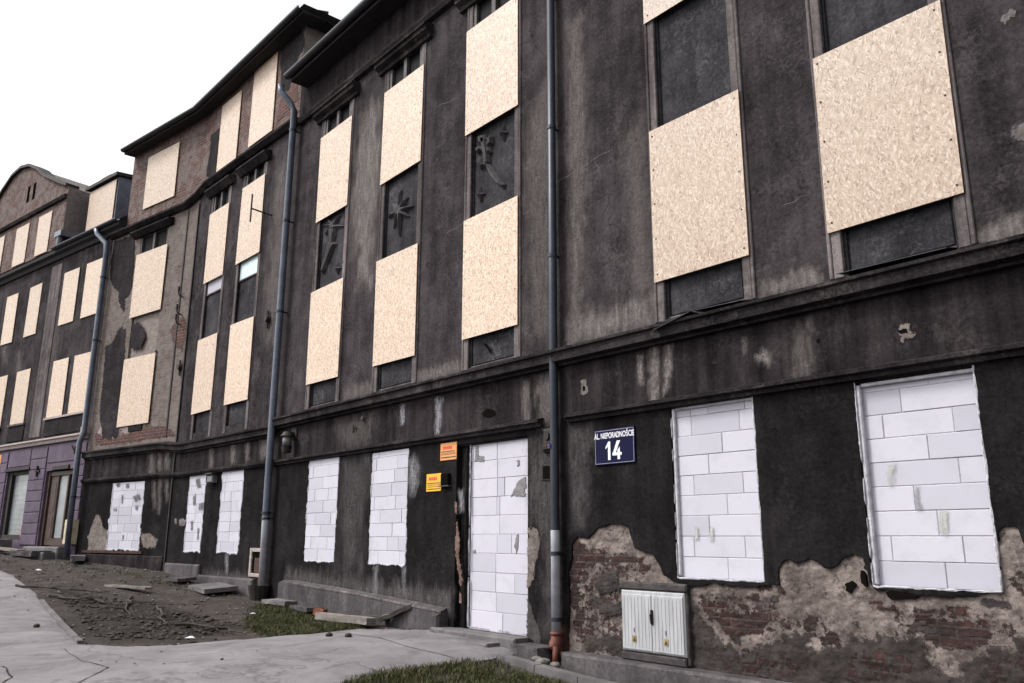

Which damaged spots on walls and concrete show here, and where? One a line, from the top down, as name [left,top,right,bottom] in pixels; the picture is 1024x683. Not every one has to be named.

spalling [170,317,187,351]
spalling [898,322,916,343]
flaking render [95,322,175,446]
leakage [637,344,672,400]
spalling [87,514,108,550]
spalling [140,533,158,549]
flaking render [455,502,463,603]
flaking render [526,526,541,644]
spalling [569,524,1024,683]